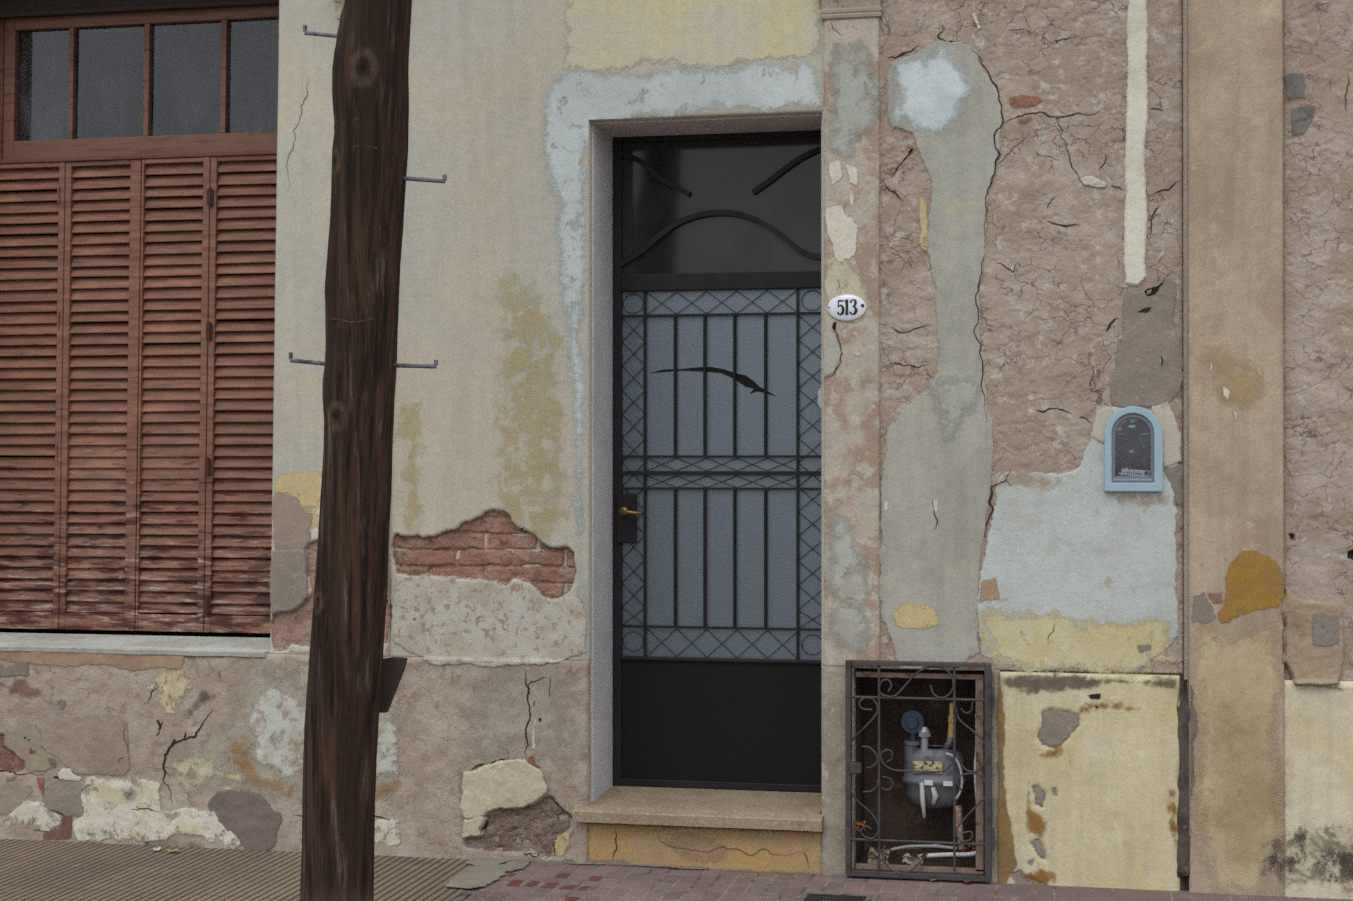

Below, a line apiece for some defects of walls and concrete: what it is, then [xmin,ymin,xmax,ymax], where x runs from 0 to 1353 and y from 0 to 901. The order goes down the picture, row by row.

crack [286,78,309,189]
peeling [543,0,881,520]
peeling [0,470,322,849]
crack [117,689,213,804]
peeling [375,686,399,800]
peeling [375,818,400,846]
peeling [383,510,587,858]
spalling [1033,785,1057,807]
spalling [1038,709,1080,748]
peeling [974,606,1175,677]
peeling [1193,550,1284,894]
leakage [1264,828,1353,881]